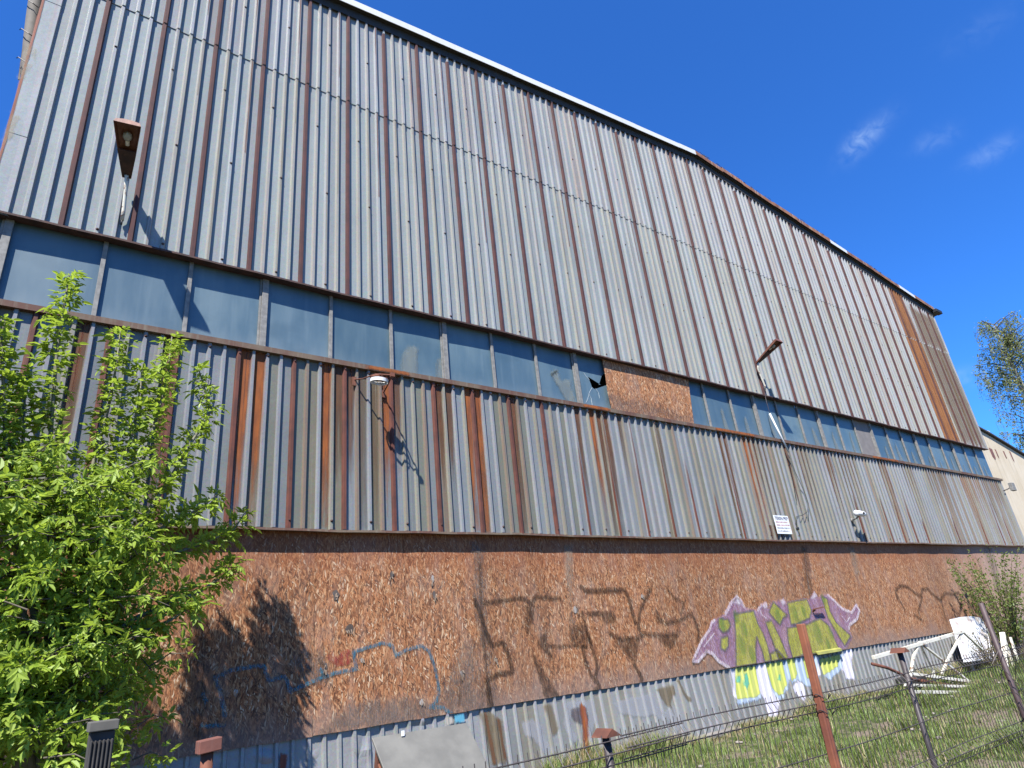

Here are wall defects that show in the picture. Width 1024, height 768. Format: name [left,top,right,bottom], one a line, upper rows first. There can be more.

corrosion [831,262,981,446]
corrosion [232,350,265,524]
corrosion [321,364,409,497]
corrosion [435,383,453,464]
corrosion [464,388,489,531]
corrosion [509,396,525,519]
corrosion [573,404,626,514]
corrosion [716,428,783,539]
corrosion [782,443,813,505]
corrosion [822,450,865,503]
corrosion [873,456,913,523]